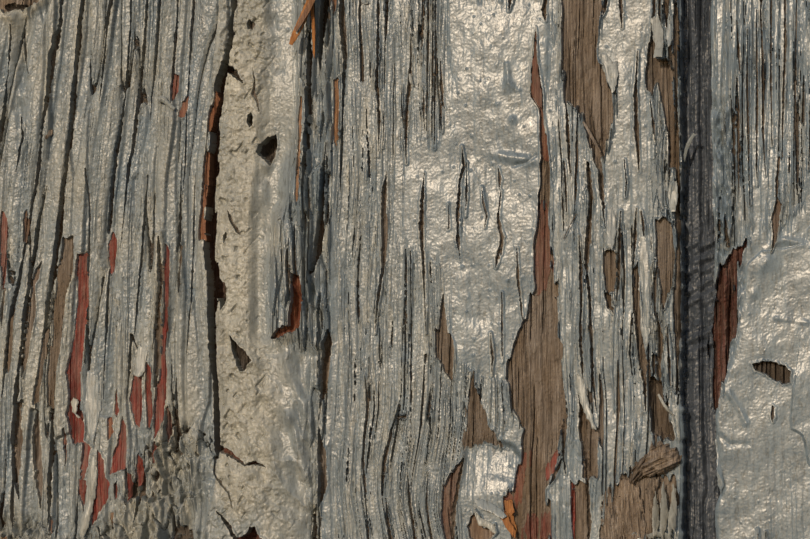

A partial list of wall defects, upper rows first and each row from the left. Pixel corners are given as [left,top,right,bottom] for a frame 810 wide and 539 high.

peeling [562,0,618,170]
peeling [469,28,564,539]
peeling [135,344,148,377]
peeling [708,239,747,409]
peeling [462,372,503,450]
peeling [71,370,103,538]
peeling [442,460,464,539]
peeling [610,467,680,539]
peeling [715,437,724,496]